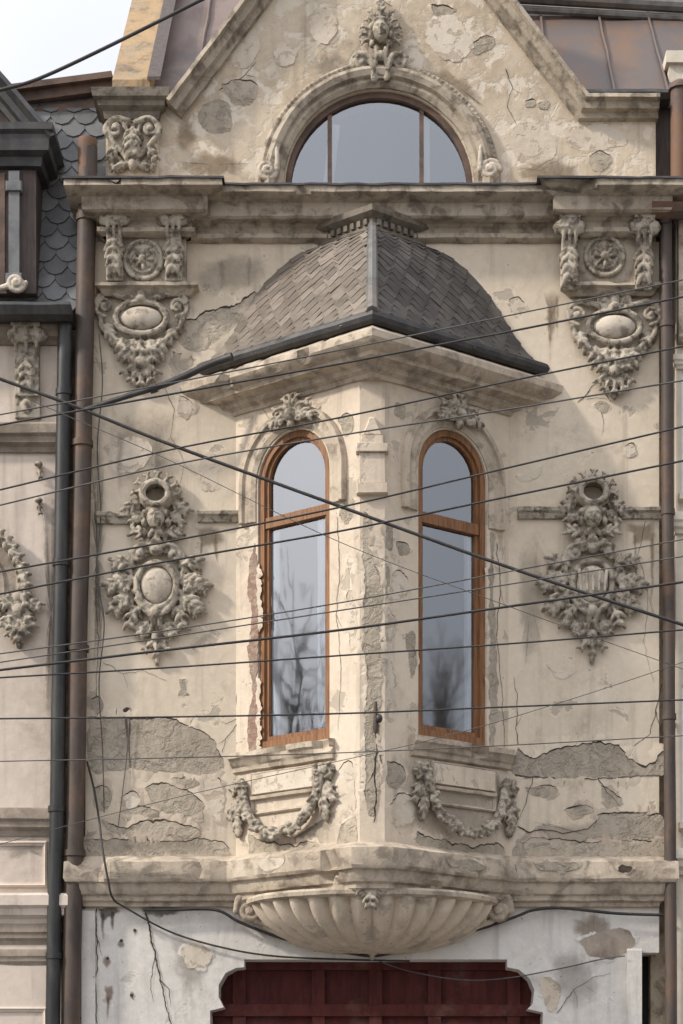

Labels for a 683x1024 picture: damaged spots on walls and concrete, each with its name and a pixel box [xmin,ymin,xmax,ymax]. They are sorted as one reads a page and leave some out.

flaking render [197,28,298,139]
flaking render [423,3,495,62]
flaking render [508,121,628,175]
flaking render [243,543,263,751]
flaking render [334,496,664,875]
flaking render [83,696,232,857]
water stain [99,907,118,928]
crack [145,912,172,1024]
flaking render [175,940,215,973]
flaking render [574,924,640,965]